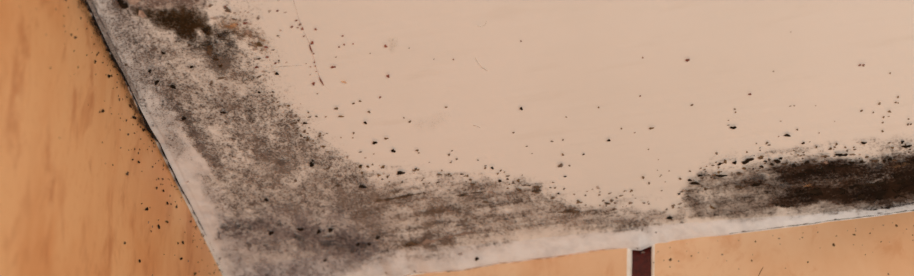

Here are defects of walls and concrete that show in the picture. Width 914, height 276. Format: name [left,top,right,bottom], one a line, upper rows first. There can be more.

damp [78,0,684,276]
damp [672,141,914,233]